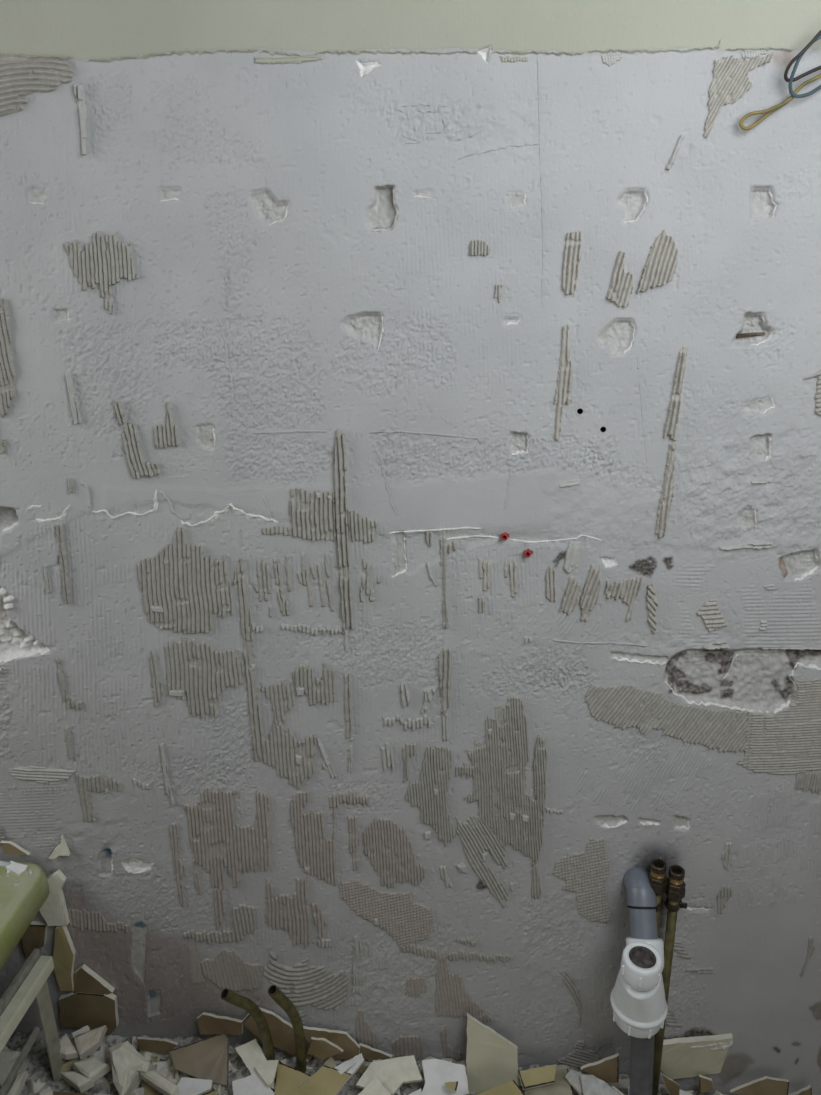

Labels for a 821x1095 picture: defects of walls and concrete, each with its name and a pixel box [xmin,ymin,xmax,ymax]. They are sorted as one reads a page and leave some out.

flaking render [366,185,399,231]
flaking render [731,314,775,346]
flaking render [509,432,529,455]
flaking render [0,507,19,536]
crack [26,489,279,528]
flaking render [0,586,50,663]
flaking render [609,648,821,716]
flaking render [594,815,690,830]
spalling [0,841,30,876]
flaking render [121,859,154,874]
spalling [137,1007,624,1095]
spalling [730,1076,812,1095]